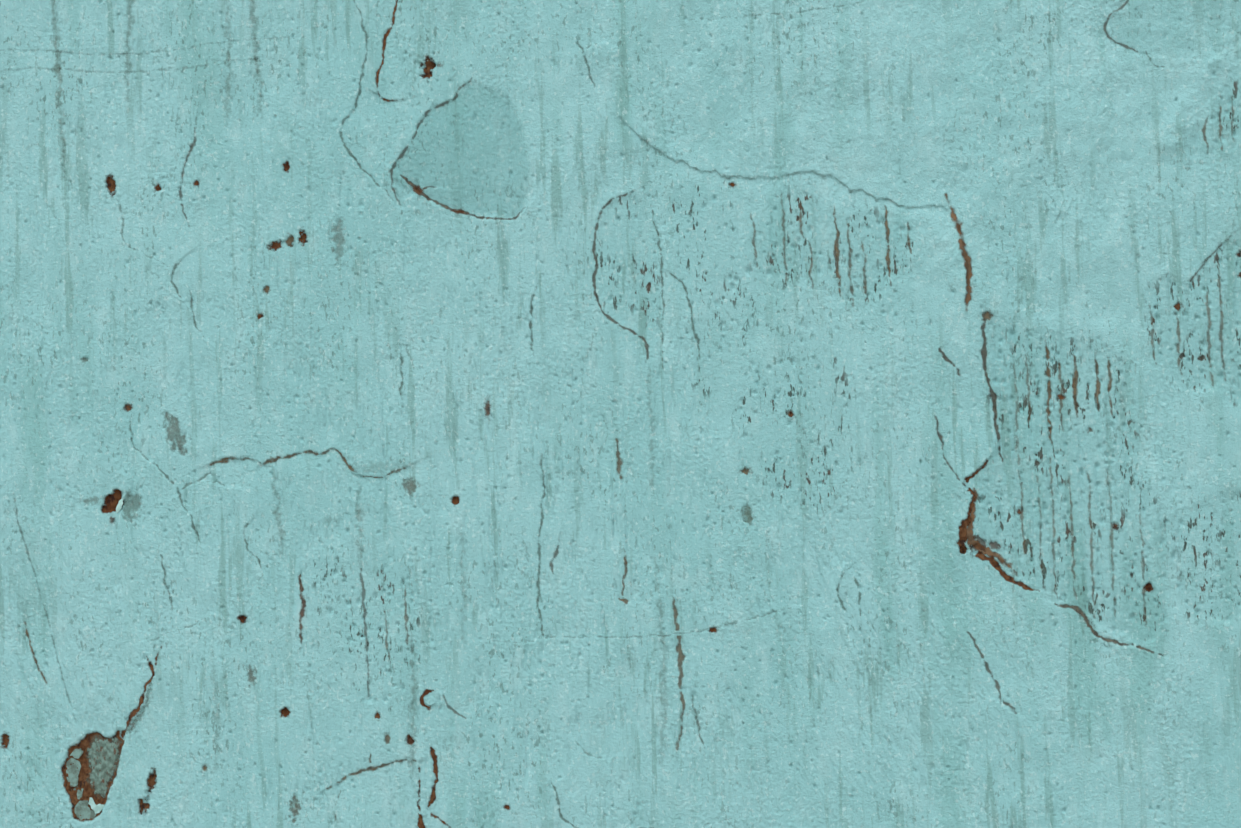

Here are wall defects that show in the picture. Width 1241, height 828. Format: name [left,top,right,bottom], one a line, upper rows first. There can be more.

crack [340,0,398,185]
crack [945,194,972,310]
crack [673,275,700,370]
crack [130,427,405,536]
crack [935,416,966,486]
crack [1055,604,1163,656]
spalling [61,647,162,821]
crack [327,747,451,828]